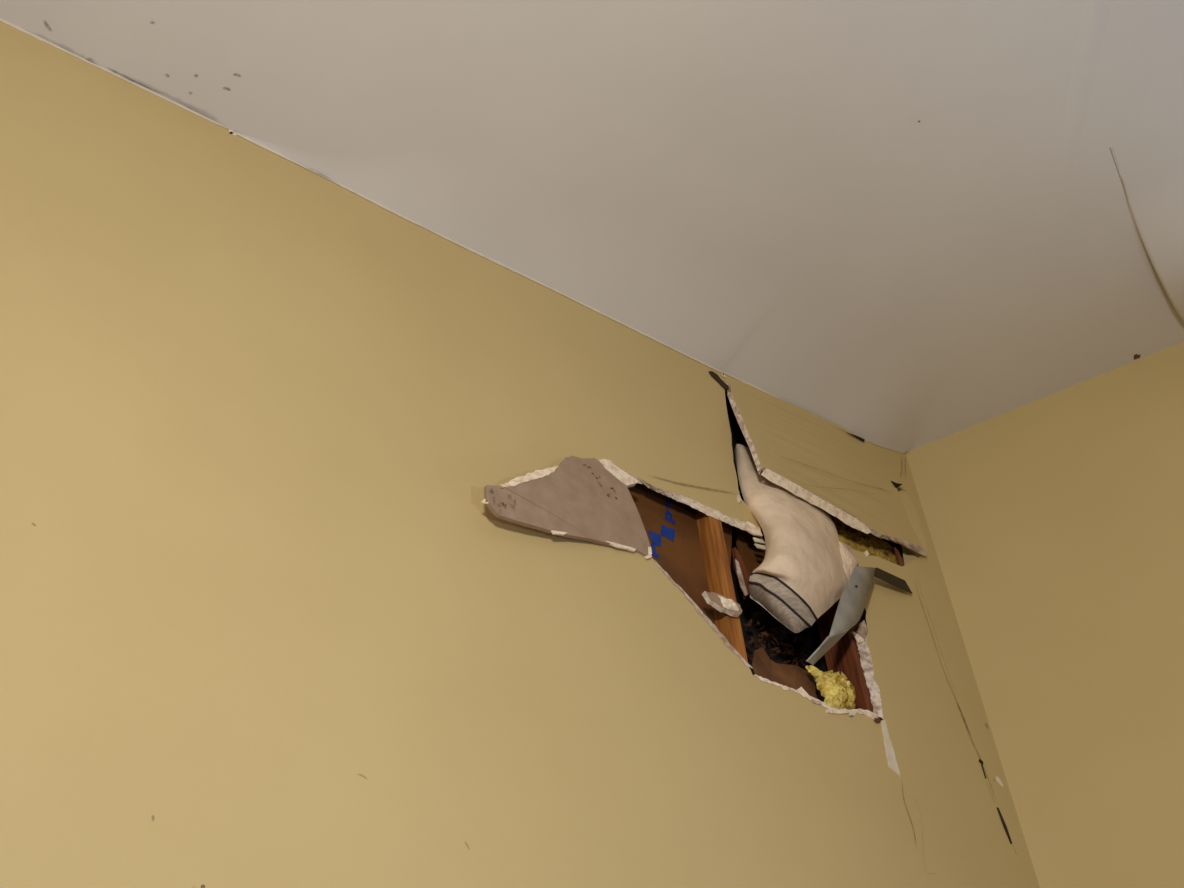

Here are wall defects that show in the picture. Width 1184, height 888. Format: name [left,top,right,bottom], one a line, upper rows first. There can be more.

peeling [599,459,638,488]
peeling [606,541,652,559]
peeling [746,521,766,551]
crack [997,807,1012,844]